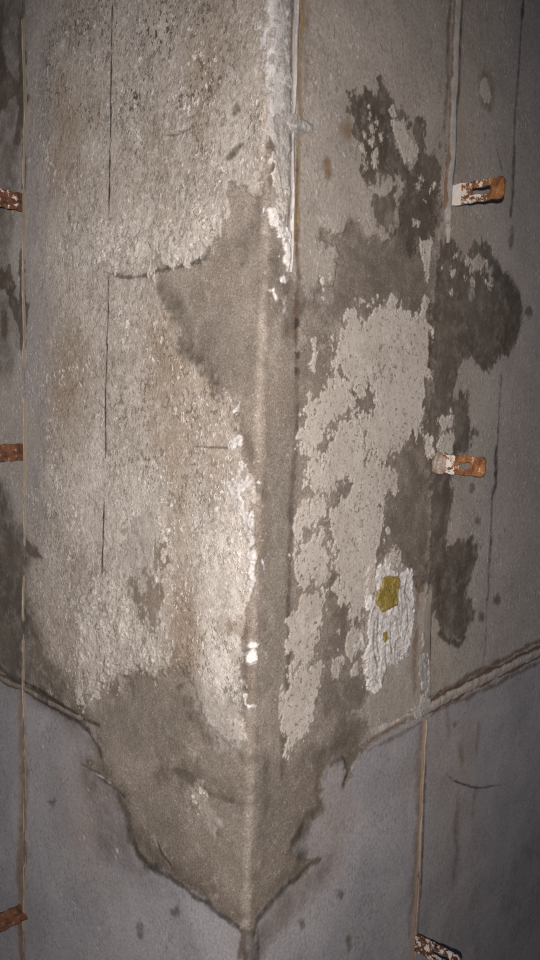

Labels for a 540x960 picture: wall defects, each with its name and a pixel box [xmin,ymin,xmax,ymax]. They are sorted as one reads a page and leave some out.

crack [106,5,114,206]
peeling [390,116,419,165]
peeling [471,253,488,276]
crack [105,265,168,458]
water stain [346,75,532,648]
water stain [228,435,243,451]
water stain [225,461,265,588]
spalling [76,143,455,932]
efflorescence [235,677,257,710]
efflorescence [353,555,415,695]